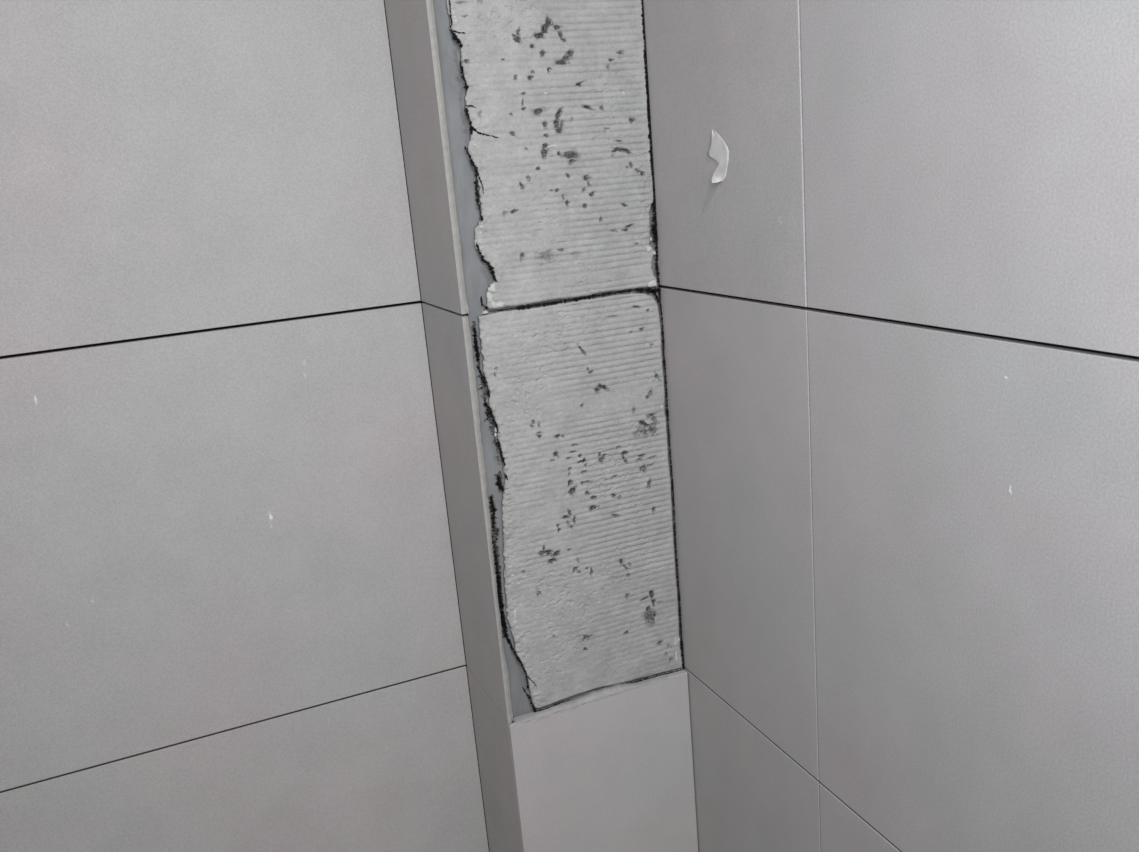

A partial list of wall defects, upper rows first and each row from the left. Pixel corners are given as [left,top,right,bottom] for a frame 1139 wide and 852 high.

spalling [513,17,573,72]
spalling [510,93,577,187]
spalling [554,434,651,510]